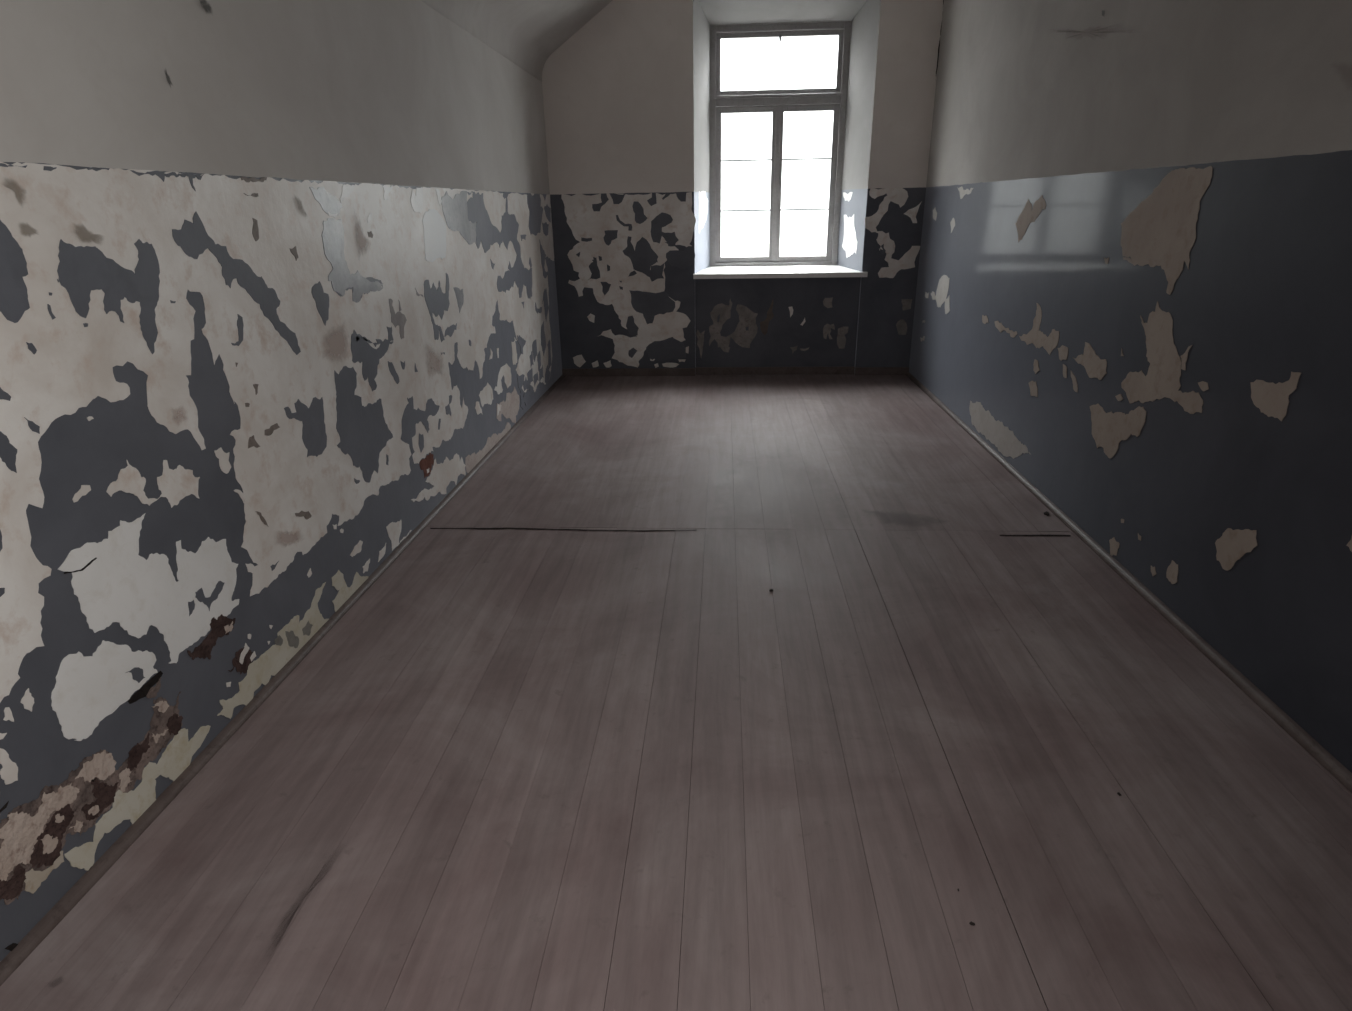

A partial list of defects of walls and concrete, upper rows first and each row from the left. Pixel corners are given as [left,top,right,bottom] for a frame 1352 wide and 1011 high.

peeling [842,188,955,278]
peeling [1015,196,1046,242]
peeling [896,275,950,342]
peeling [1090,166,1213,458]
peeling [982,303,1124,397]
peeling [969,401,1030,459]
peeling [1251,372,1301,422]
peeling [0,162,758,905]
peeling [1151,560,1178,584]
peeling [1215,528,1257,571]